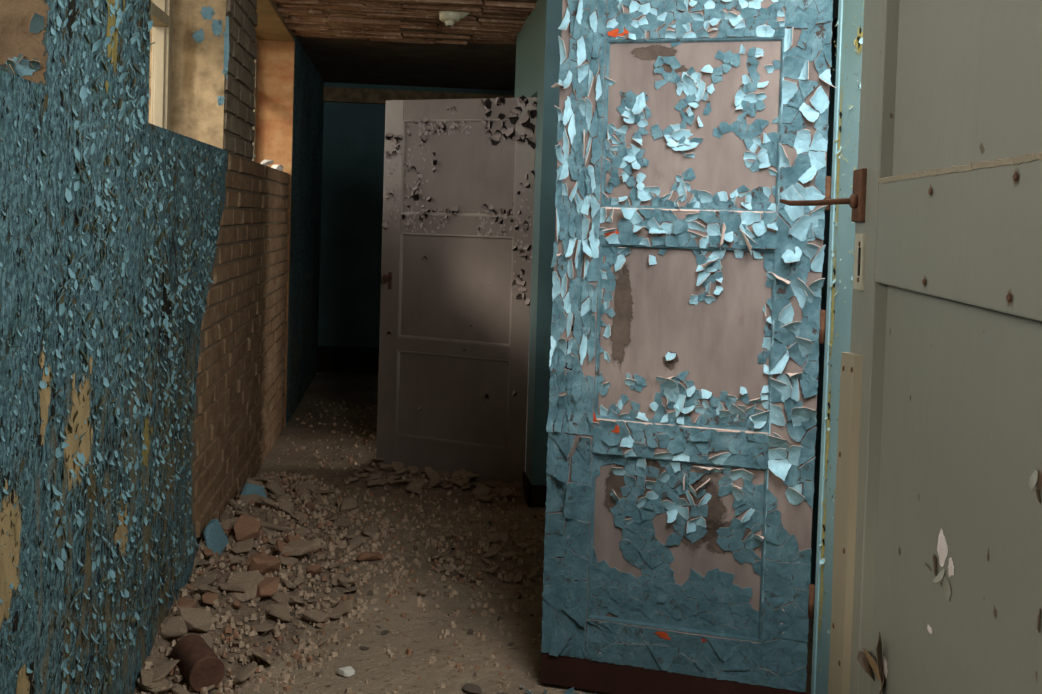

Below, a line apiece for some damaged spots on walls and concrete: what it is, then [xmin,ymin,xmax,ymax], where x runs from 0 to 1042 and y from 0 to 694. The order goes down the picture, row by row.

spalling [854,16,863,54]
peeling [382,95,537,234]
peeling [476,170,535,306]
flaking render [0,0,290,694]
peeling [541,0,860,692]
spalling [1028,470,1042,503]
spalling [925,529,954,601]
spalling [857,632,888,694]